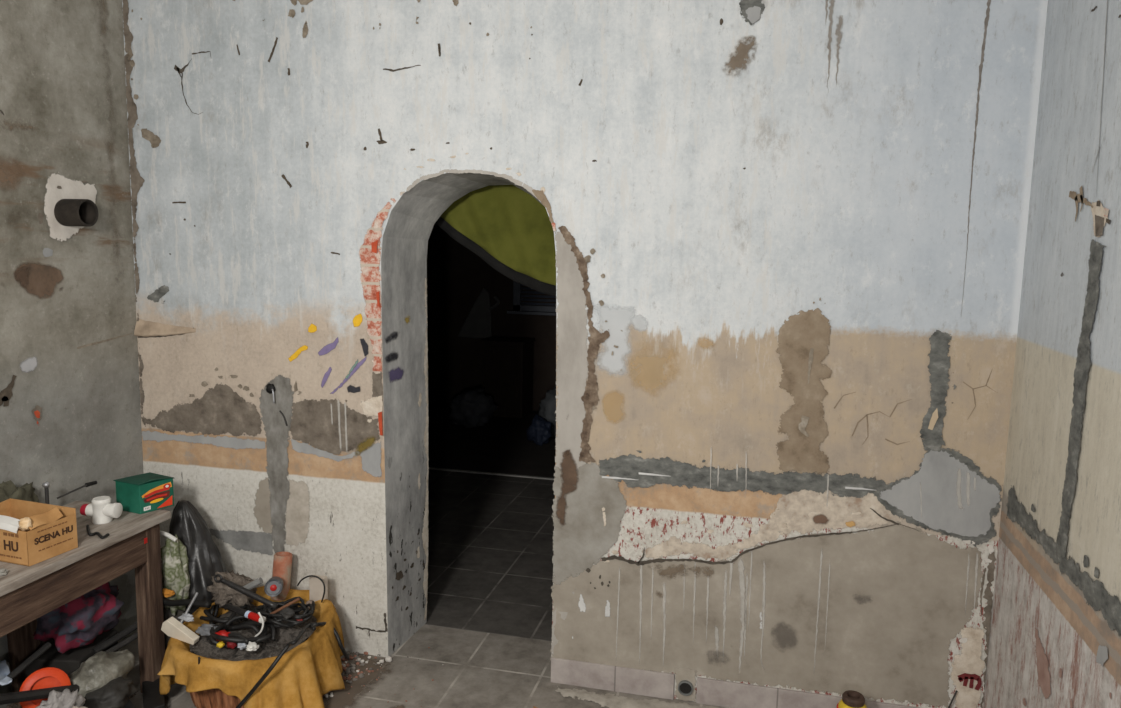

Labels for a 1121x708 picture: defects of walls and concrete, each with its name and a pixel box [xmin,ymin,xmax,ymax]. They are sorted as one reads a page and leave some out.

flaking render [288,0,313,38]
damp [726,36,756,73]
damp [825,0,843,85]
flaking render [122,0,161,321]
flaking render [14,262,63,298]
flaking render [359,142,622,463]
flaking render [138,347,262,437]
flaking render [290,382,383,455]
flaking render [550,489,994,708]